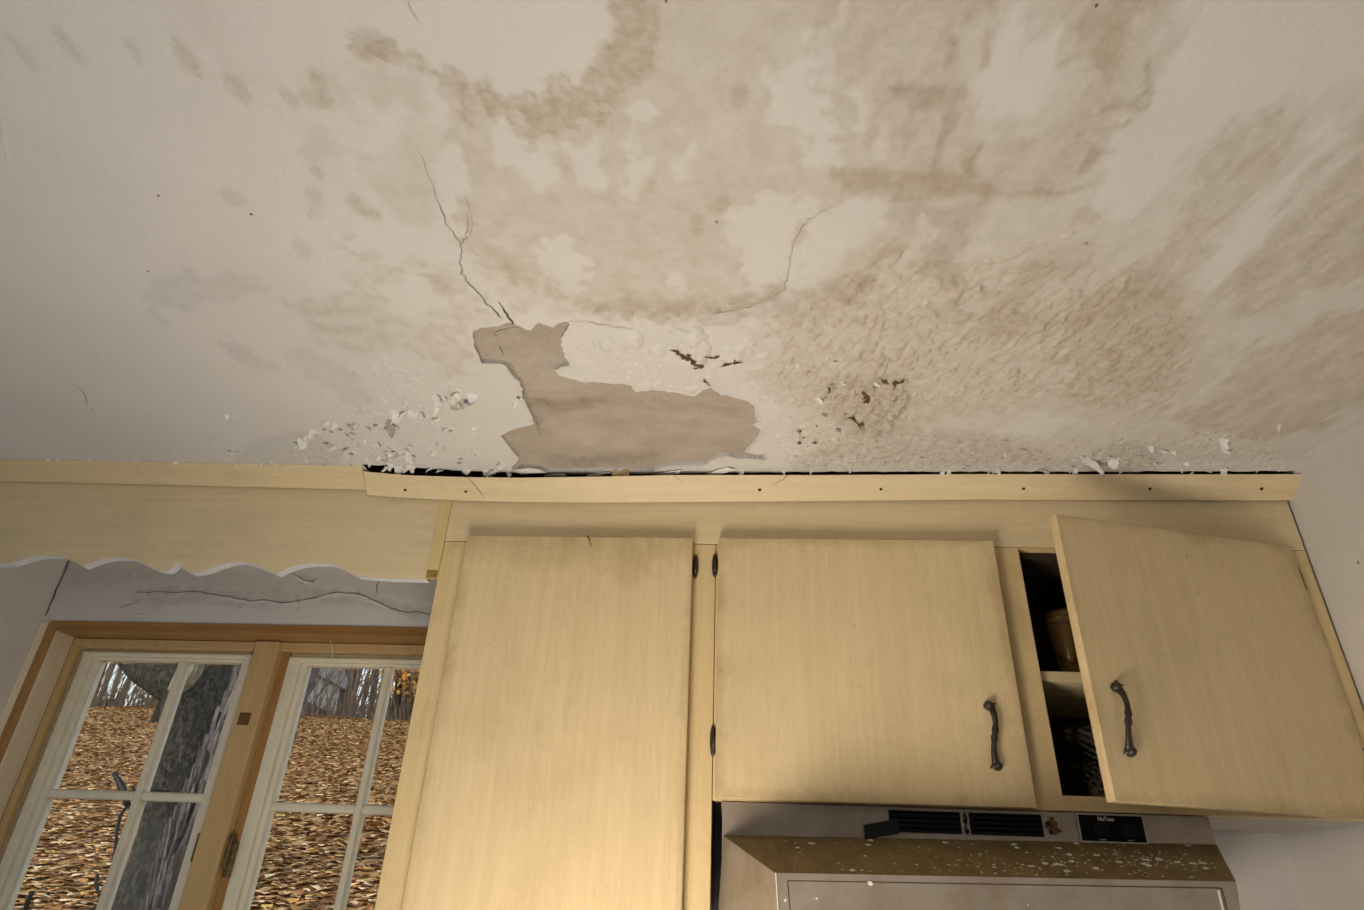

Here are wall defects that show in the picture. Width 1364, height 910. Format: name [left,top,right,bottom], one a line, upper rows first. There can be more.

crack [423,160,517,355]
peeling [213,317,770,477]
spalling [779,361,1296,475]
crack [120,579,430,621]